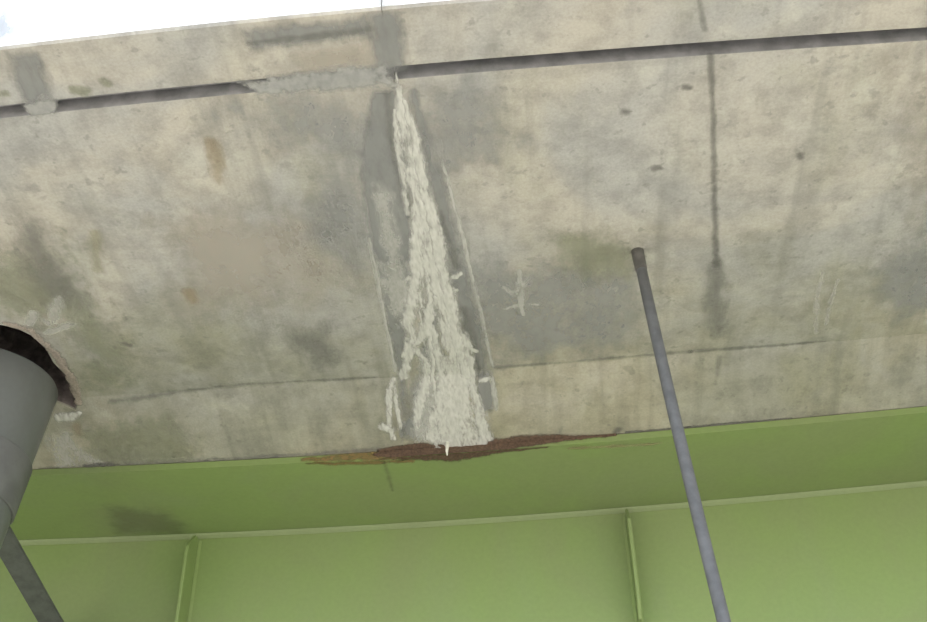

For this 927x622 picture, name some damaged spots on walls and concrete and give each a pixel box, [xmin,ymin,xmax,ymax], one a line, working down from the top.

damp [249,13,629,456]
corrosion [301,433,617,465]